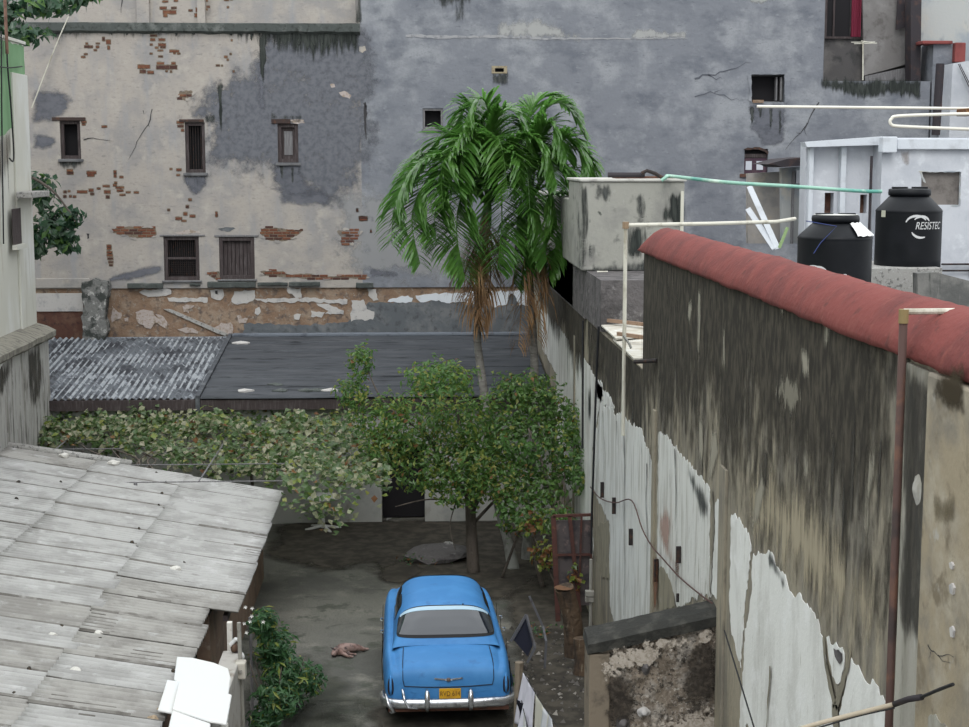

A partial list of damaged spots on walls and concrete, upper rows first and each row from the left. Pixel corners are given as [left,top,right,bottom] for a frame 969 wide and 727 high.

flaking render [137,34,181,74]
crack [695,62,749,100]
damp [822,77,920,98]
damp [193,0,473,276]
damp [184,176,206,194]
flaking render [106,226,157,267]
flaking render [260,226,303,244]
flaking render [139,269,475,336]
peeling [490,290,527,307]
damp [533,188,964,637]
peeling [541,310,719,621]
peeling [729,513,885,727]